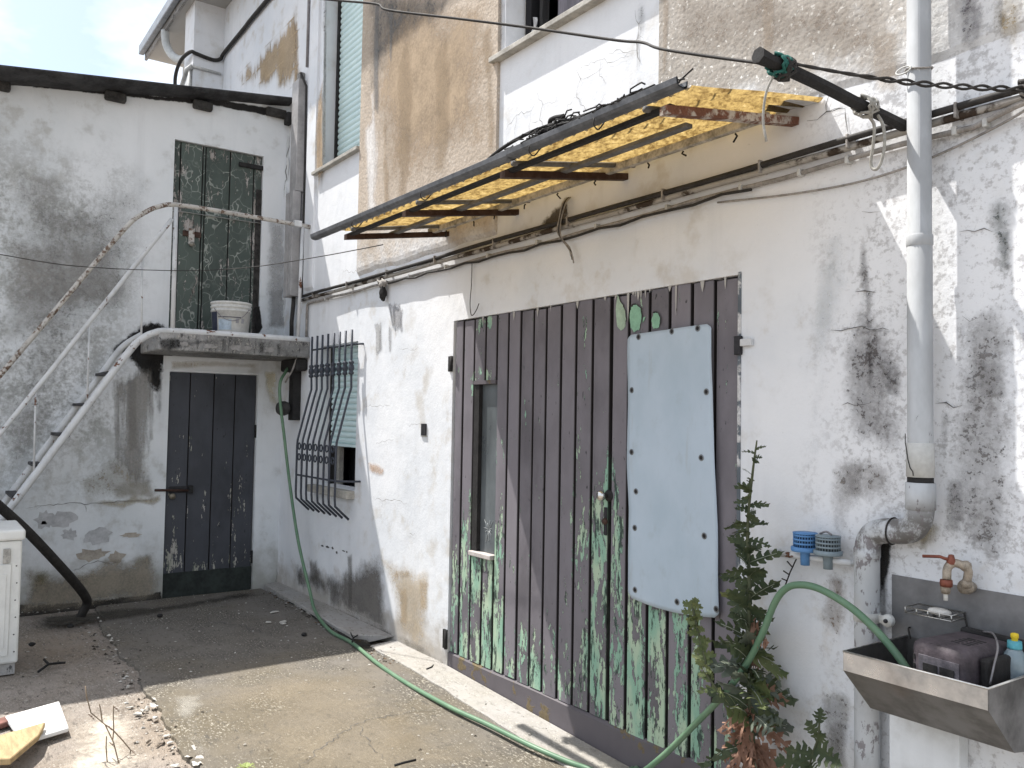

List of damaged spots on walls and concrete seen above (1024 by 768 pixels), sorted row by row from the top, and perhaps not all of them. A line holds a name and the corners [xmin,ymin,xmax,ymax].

leakage [373,0,475,163]
crack [510,16,643,145]
leakage [366,122,376,208]
leakage [88,323,181,495]
leakage [847,316,899,448]
leakage [950,315,1010,553]
flaking render [33,510,142,564]
leakage [298,567,443,663]